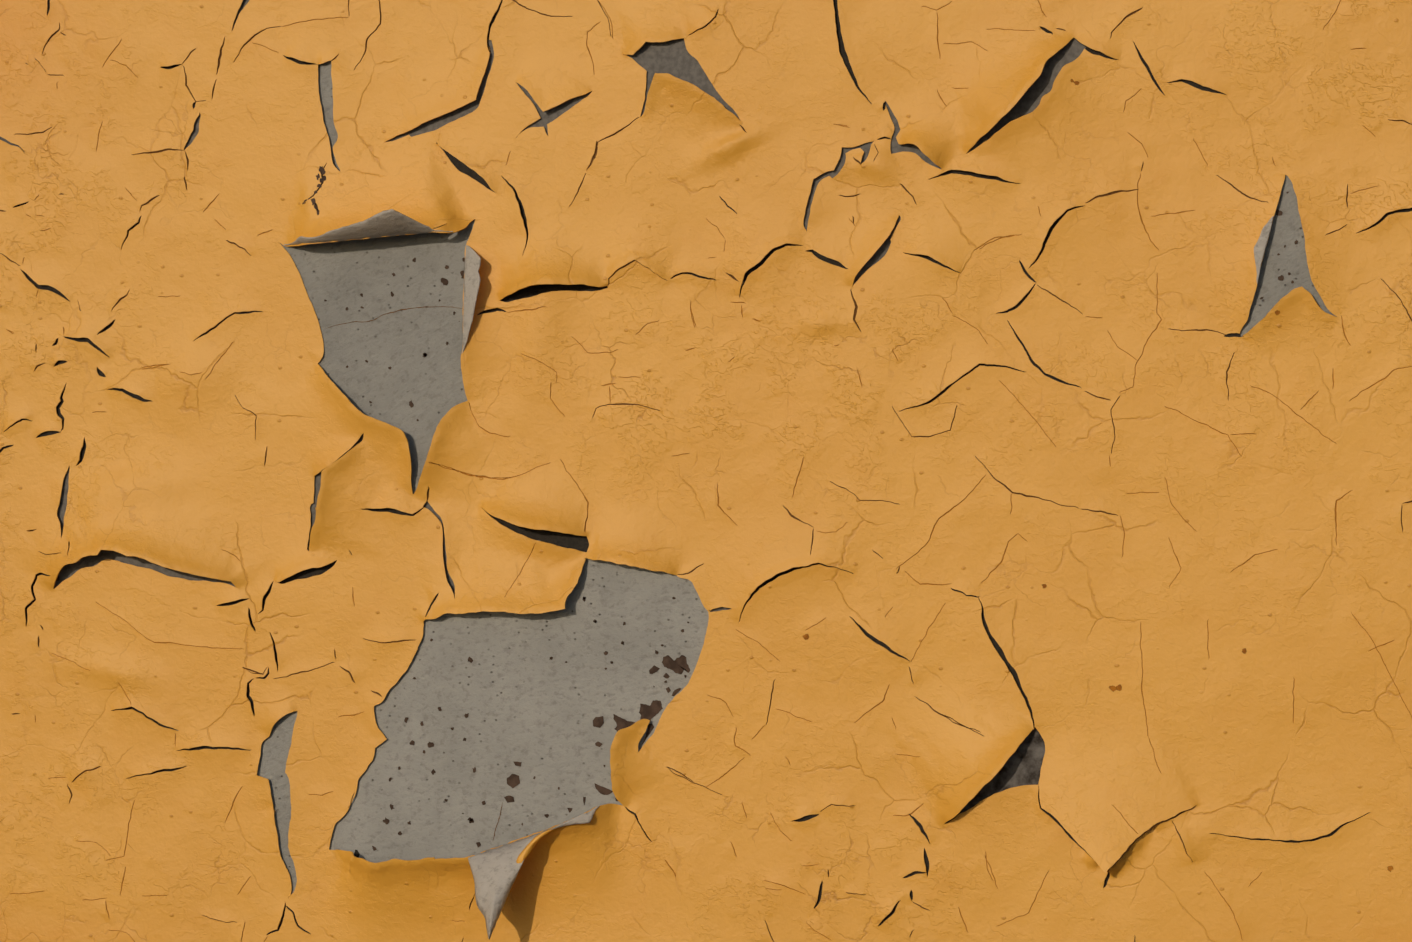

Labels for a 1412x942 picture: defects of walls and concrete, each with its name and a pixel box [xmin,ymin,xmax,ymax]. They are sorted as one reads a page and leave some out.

crack [0,193,278,465]
crack [103,0,381,255]
crack [328,302,548,328]
crack [498,151,533,248]
crack [483,0,614,70]
peeling [515,3,762,164]
peeling [1196,130,1376,375]
peeling [20,32,709,940]
crack [363,459,589,532]
crack [522,0,1412,942]
crack [20,529,439,919]
crack [203,877,317,942]